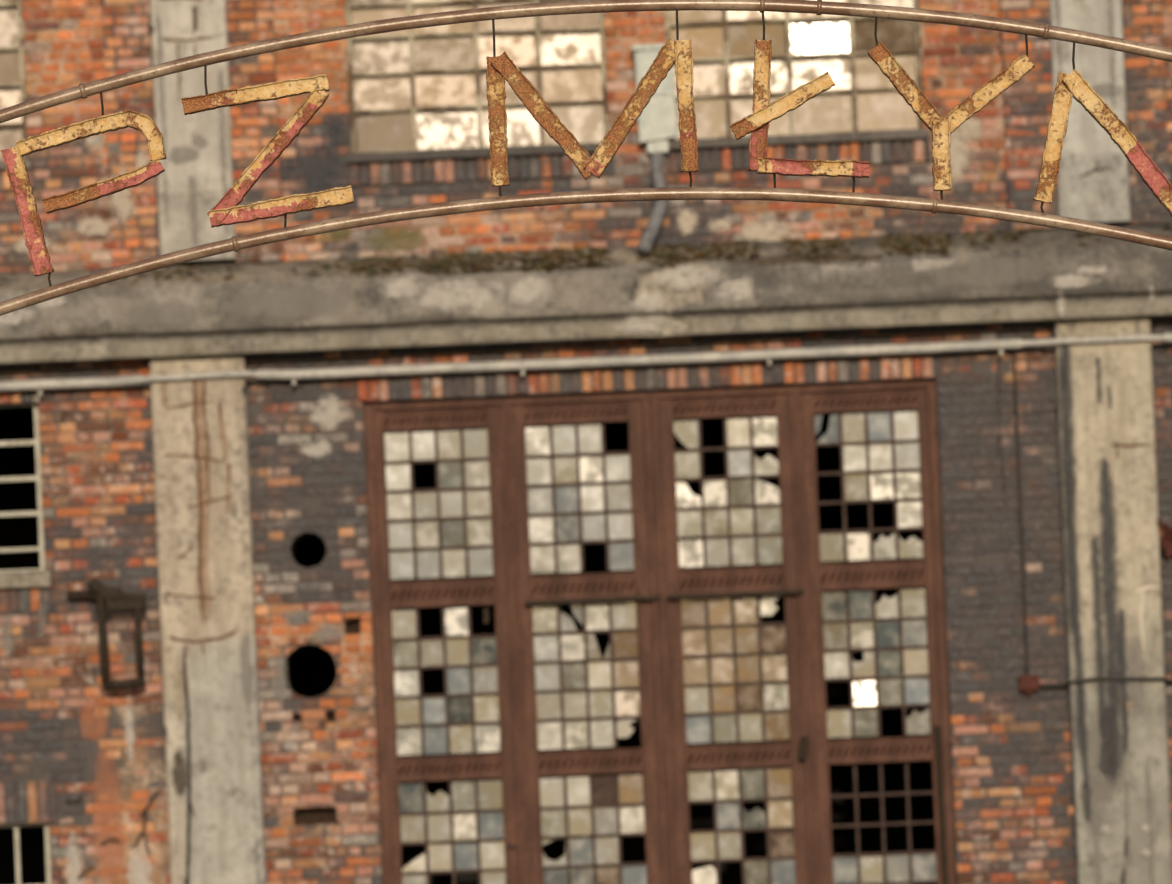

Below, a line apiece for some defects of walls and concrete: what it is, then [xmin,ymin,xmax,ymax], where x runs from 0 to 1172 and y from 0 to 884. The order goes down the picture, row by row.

water stain [0,297,66,324]
water stain [380,277,548,312]
water stain [620,265,751,333]
water stain [809,258,1039,297]
water stain [1054,267,1106,316]
water stain [1059,344,1145,880]